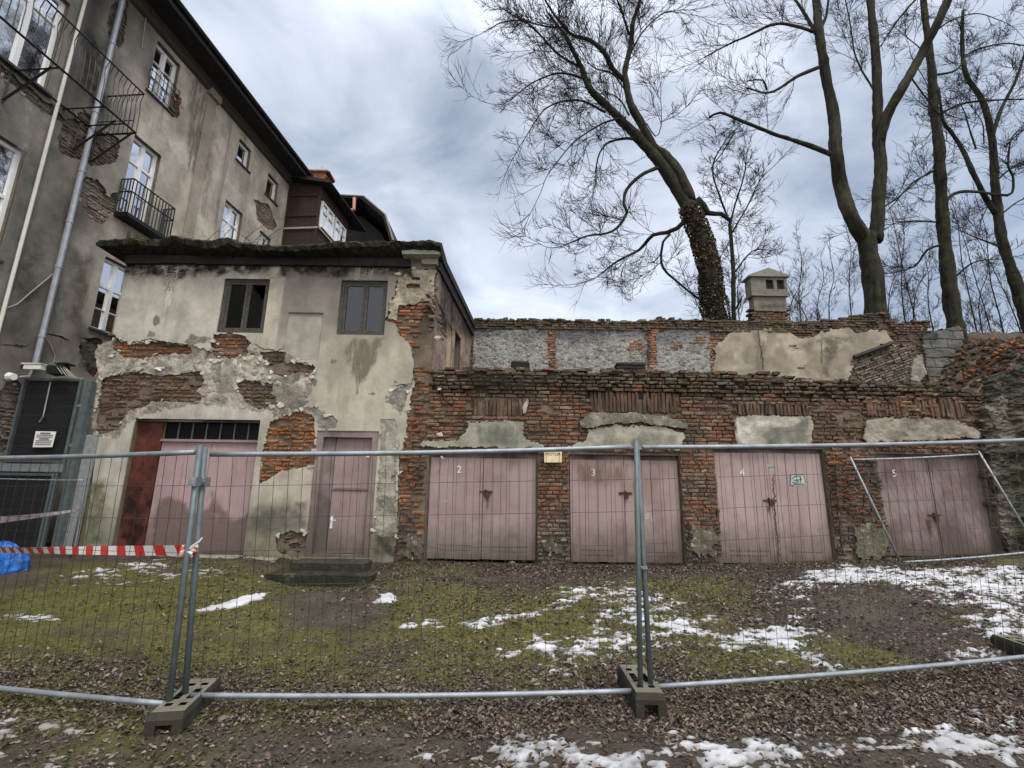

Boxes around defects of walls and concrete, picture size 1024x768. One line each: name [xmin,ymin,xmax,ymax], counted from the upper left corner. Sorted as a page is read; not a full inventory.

spalling [107,2,127,48]
spalling [0,69,122,224]
spalling [254,199,276,231]
water stain [346,339,380,381]
spalling [0,380,21,452]
peeling [79,316,338,490]
spalling [370,266,448,561]
spalling [276,529,309,552]
crack [772,477,780,562]